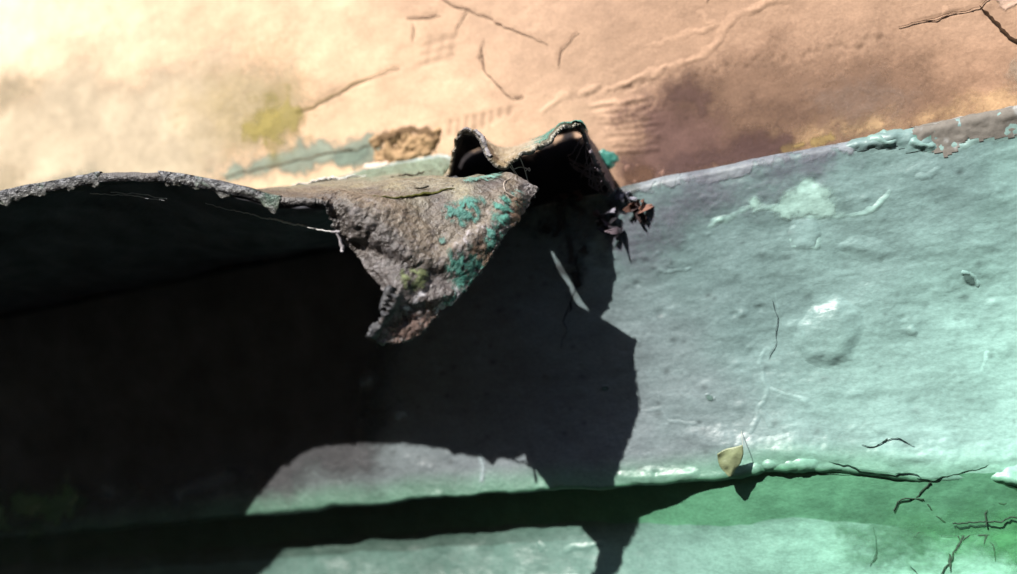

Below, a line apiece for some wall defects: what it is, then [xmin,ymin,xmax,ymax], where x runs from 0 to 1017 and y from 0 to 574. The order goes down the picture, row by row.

crack [903,0,1017,43]
water stain [0,44,303,190]
water stain [693,45,1017,175]
spalling [911,105,1017,157]
water stain [608,177,726,258]
peeling [0,126,539,529]
crack [832,438,988,479]